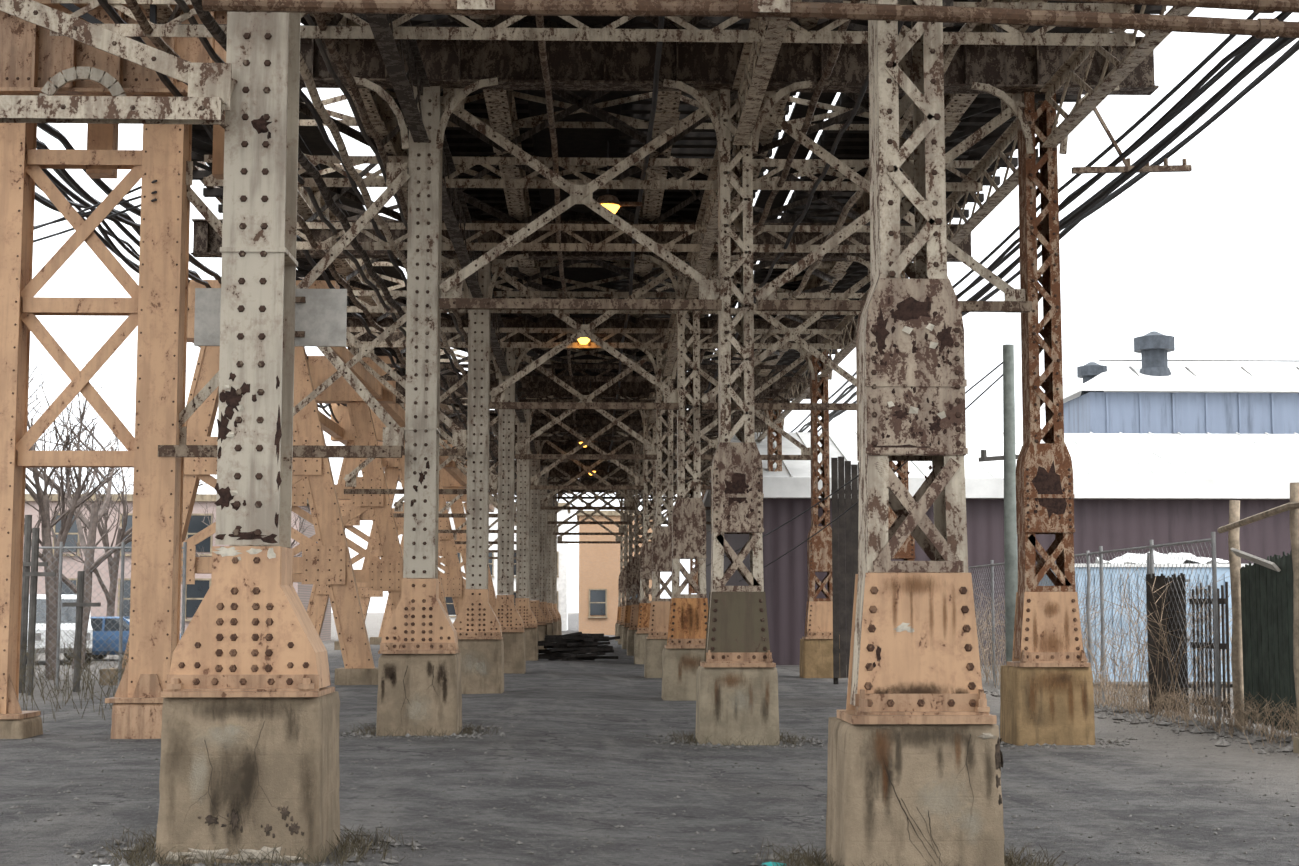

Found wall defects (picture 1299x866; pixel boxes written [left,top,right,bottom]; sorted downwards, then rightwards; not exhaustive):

peeling [872,296,954,368]
water stain [381,666,396,696]
water stain [427,662,447,700]
water stain [211,761,253,836]
water stain [872,730,958,794]
water stain [968,748,992,788]